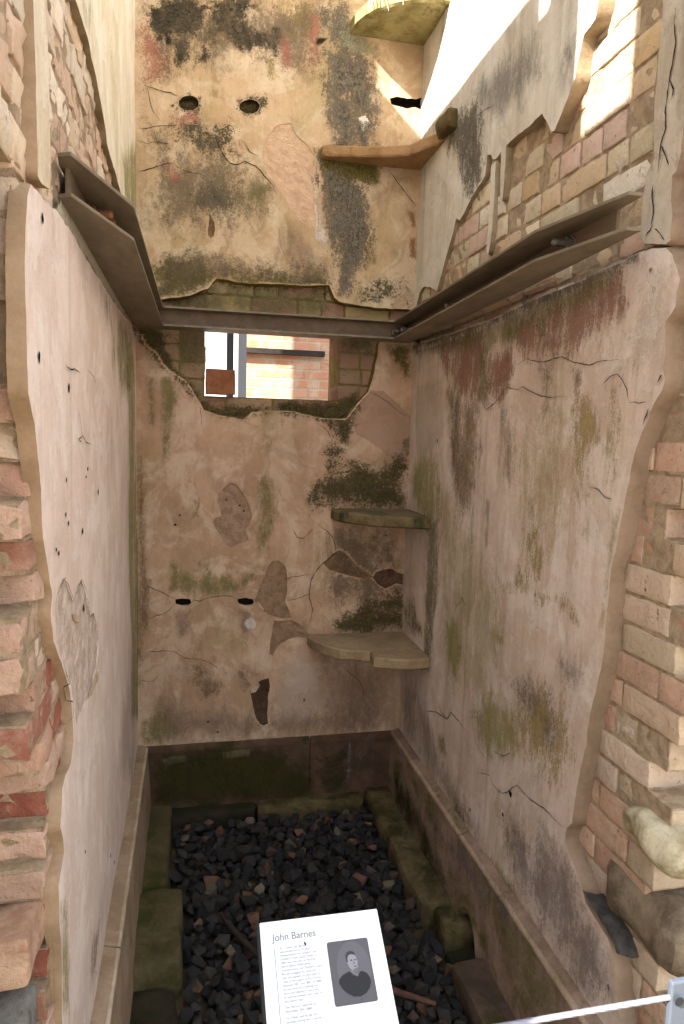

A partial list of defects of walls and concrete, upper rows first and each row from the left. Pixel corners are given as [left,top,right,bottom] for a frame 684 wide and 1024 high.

crack [137,85,203,176]
damp [146,0,291,76]
crack [217,142,274,186]
flaking render [262,123,322,228]
damp [281,2,382,146]
crack [645,8,676,240]
damp [311,161,409,305]
crack [479,356,648,424]
damp [447,391,481,508]
flaking render [255,560,308,656]
flaking render [238,669,276,736]
spalling [0,900,46,1024]